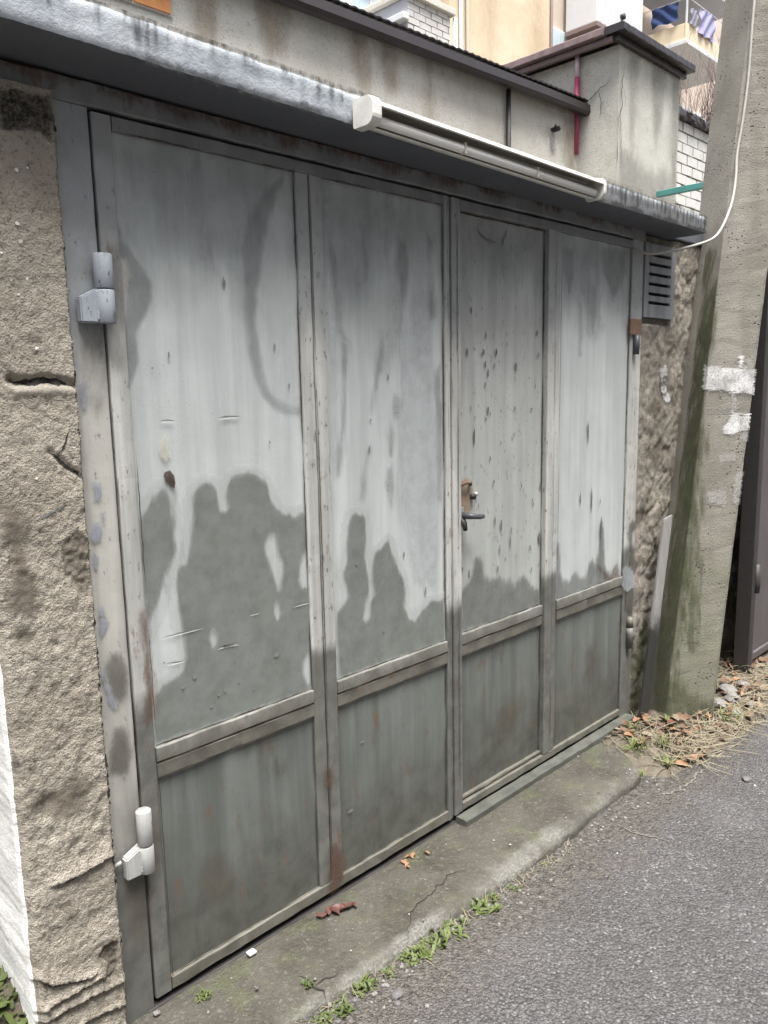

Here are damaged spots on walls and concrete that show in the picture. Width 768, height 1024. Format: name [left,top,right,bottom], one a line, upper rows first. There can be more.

crack [581,67,626,161]
crack [8,227,77,400]
crack [50,426,85,501]
water stain [141,472,312,743]
water stain [337,513,445,677]
corrosion [461,479,473,513]
water stain [462,558,540,627]
water stain [556,526,610,599]
water stain [654,250,717,716]
crack [59,604,117,902]